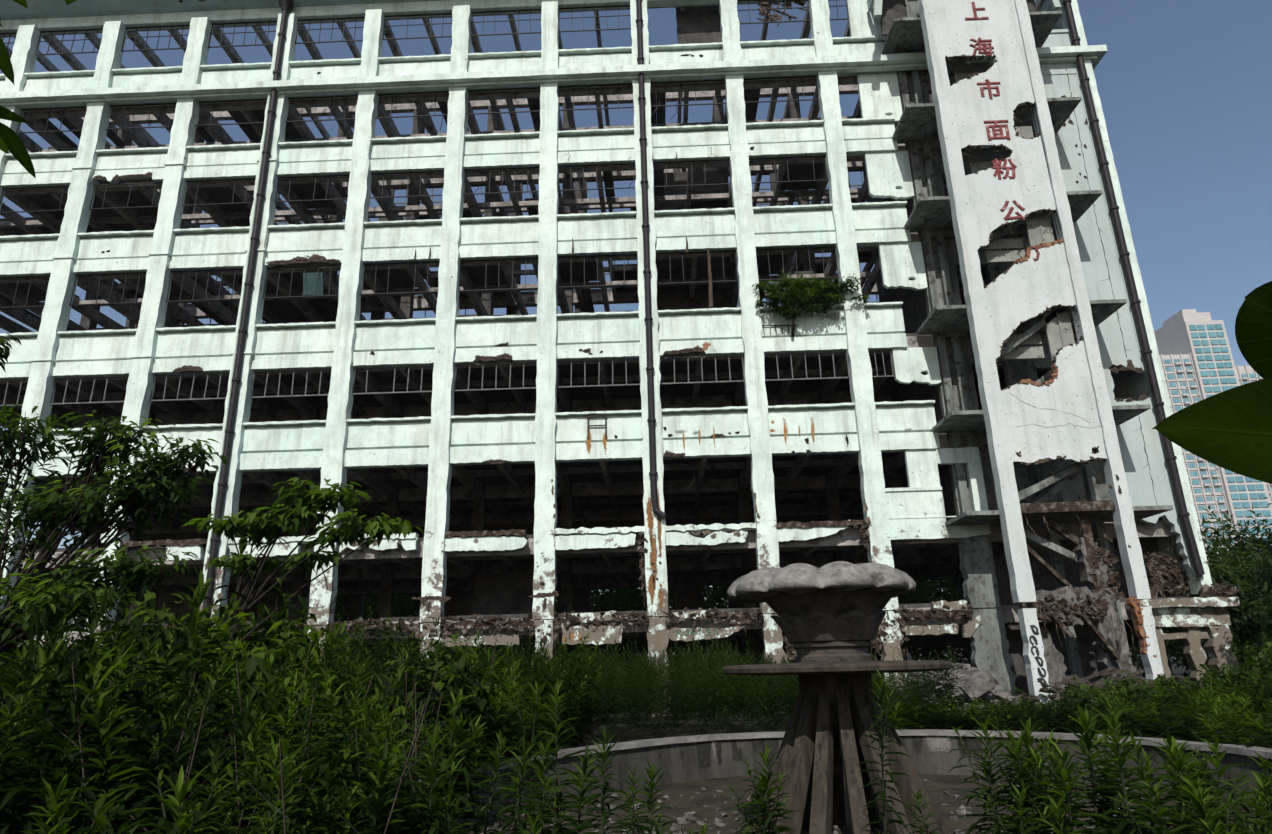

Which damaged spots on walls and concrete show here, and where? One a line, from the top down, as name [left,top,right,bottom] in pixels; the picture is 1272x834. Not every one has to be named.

spalling [945,54,997,85]
spalling [961,144,1012,173]
spalling [978,208,1057,250]
spalling [266,254,342,265]
spalling [985,239,1064,288]
spalling [665,342,711,354]
spalling [996,304,1084,391]
rust [586,430,608,452]
rust [770,418,814,442]
spalling [1014,446,1106,467]
rust [646,489,663,608]
flaking render [1126,596,1157,657]